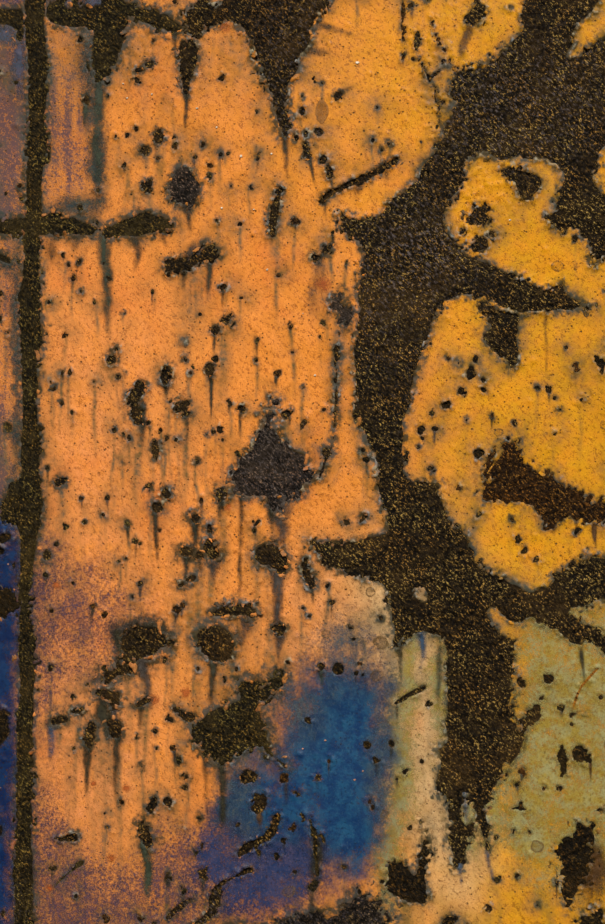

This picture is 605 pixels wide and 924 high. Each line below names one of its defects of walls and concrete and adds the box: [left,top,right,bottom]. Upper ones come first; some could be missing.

corrosion [0,0,333,924]
corrosion [164,0,605,883]